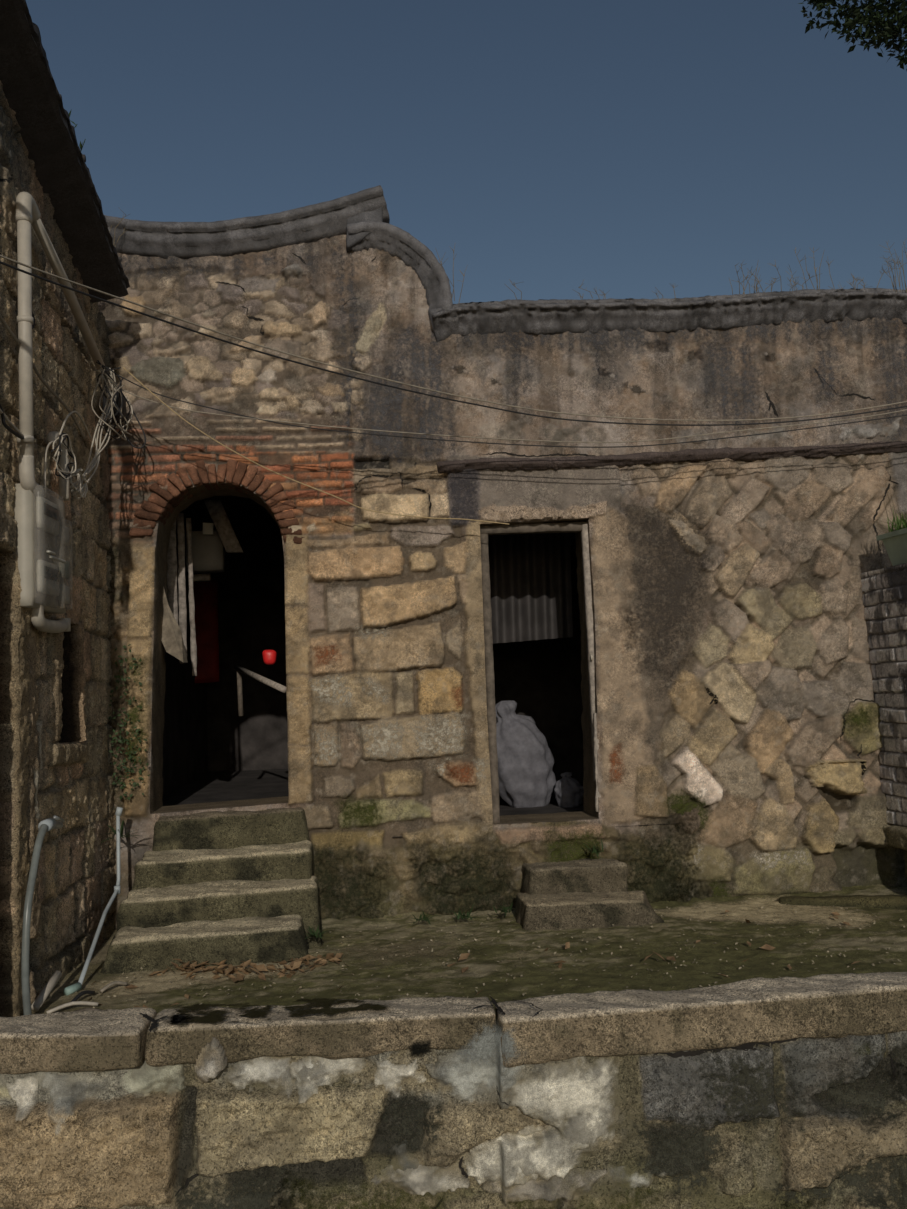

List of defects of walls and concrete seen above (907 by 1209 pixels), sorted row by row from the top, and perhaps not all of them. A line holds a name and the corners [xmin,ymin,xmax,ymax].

crack [813,367,874,400]
crack [765,392,778,416]
water stain [378,1098,442,1161]